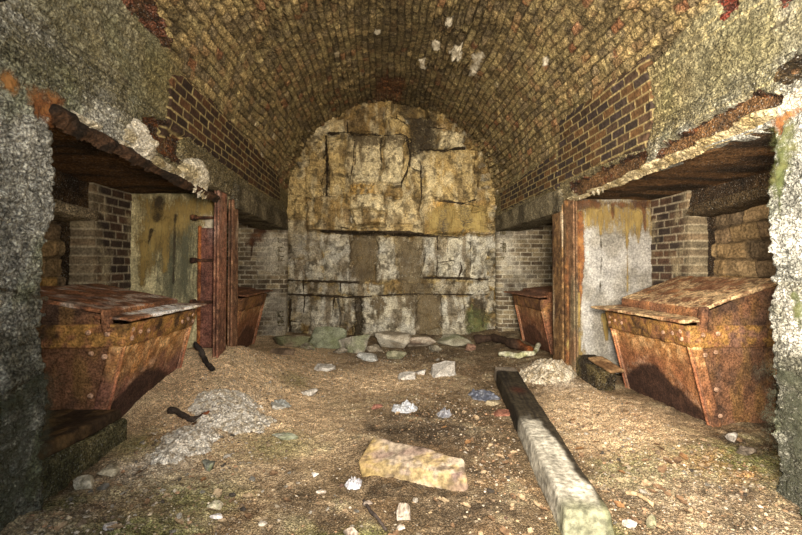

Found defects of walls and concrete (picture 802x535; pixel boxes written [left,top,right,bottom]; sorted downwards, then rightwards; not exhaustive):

rust [0,72,220,203]
crack [321,114,465,200]
efflorescence [432,39,484,76]
peeling [500,54,744,211]
spalling [753,89,784,98]
spalling [773,51,802,85]
damp [138,196,188,296]
crack [442,199,479,207]
rust [564,199,652,315]